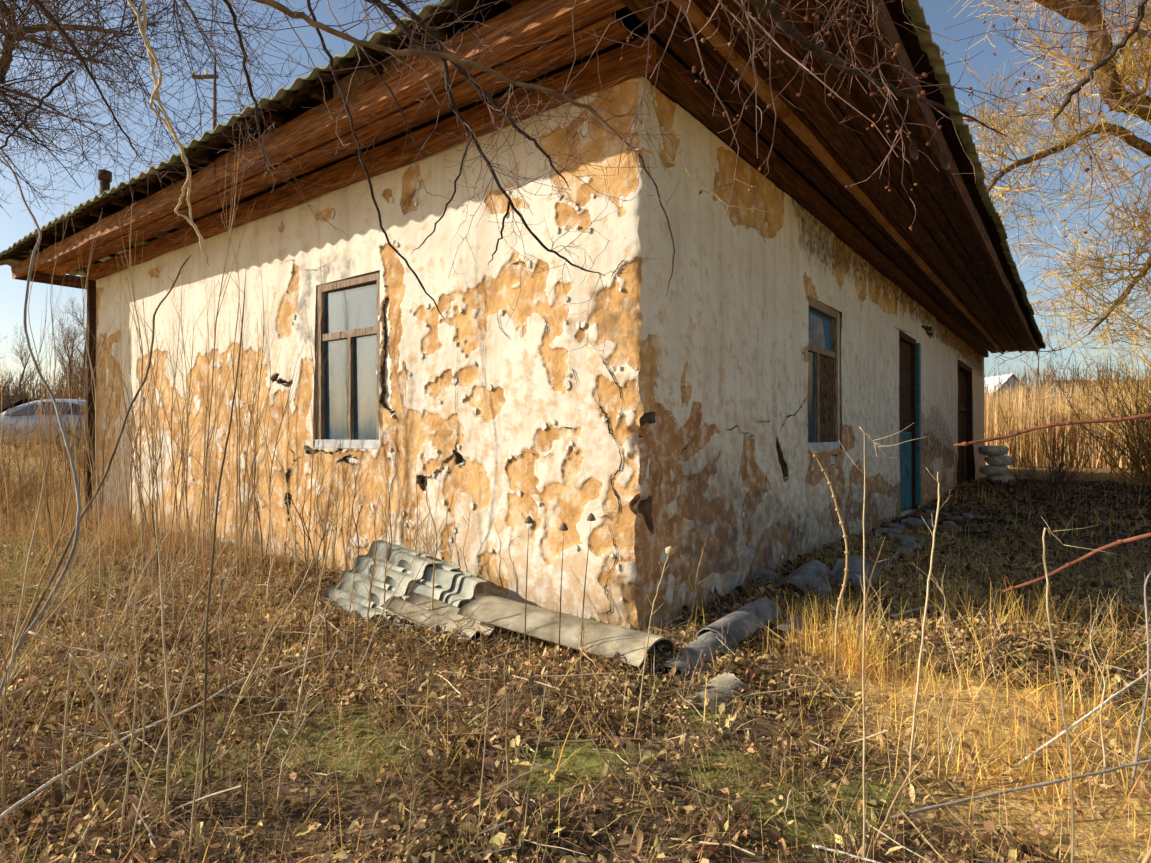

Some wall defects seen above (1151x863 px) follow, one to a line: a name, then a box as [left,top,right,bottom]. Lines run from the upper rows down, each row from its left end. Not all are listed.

flaking render [380,162,420,215]
flaking render [484,188,530,217]
flaking render [539,81,680,236]
flaking render [713,146,784,242]
flaking render [803,272,818,300]
flaking render [93,240,806,632]
crack [572,353,624,616]
flaking render [806,425,902,539]